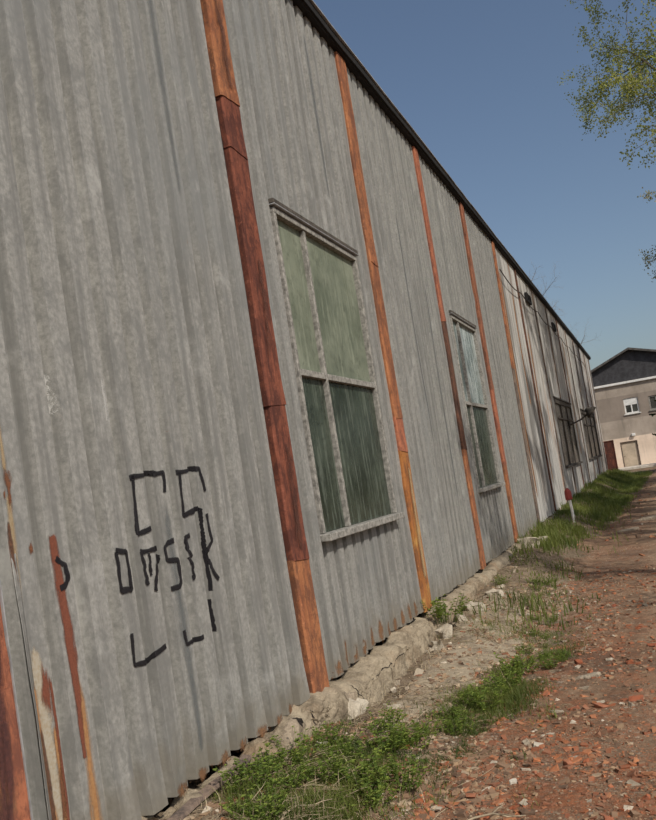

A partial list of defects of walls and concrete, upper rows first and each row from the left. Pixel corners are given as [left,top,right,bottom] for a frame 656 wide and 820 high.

corrosion [216,2,233,87]
corrosion [0,434,18,580]
corrosion [49,535,100,820]